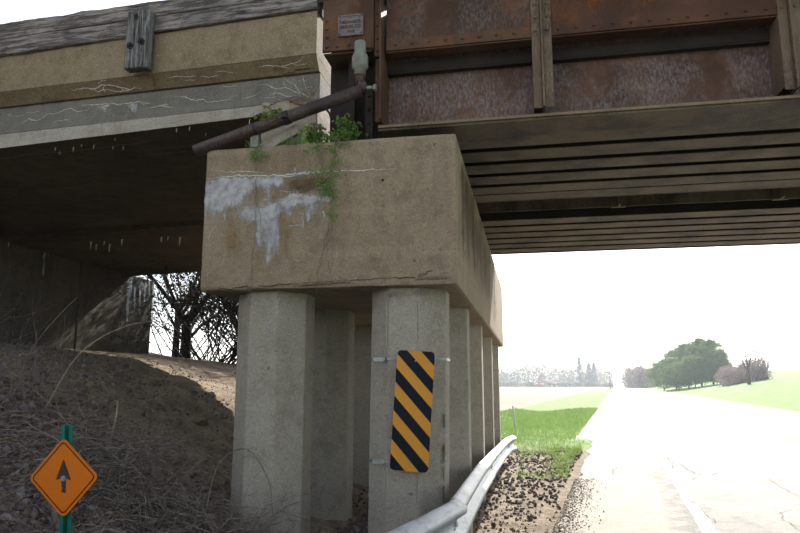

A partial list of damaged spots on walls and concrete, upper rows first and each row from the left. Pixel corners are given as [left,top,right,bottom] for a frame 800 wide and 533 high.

crack [9,58,311,126]
crack [205,168,397,194]
water stain [204,171,335,261]